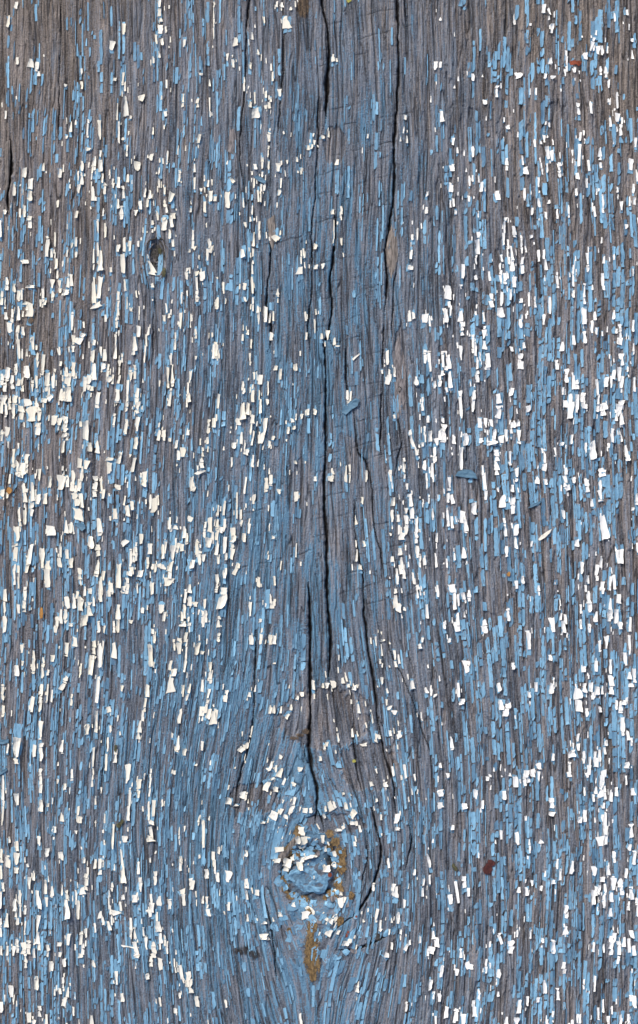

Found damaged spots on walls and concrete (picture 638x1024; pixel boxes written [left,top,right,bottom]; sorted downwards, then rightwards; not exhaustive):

peeling [150,0,186,65]
peeling [529,30,625,144]
crack [382,2,407,361]
peeling [443,138,501,217]
peeling [517,121,604,220]
peeling [616,138,638,210]
crack [308,8,348,833]
peeling [0,16,340,1024]
peeling [369,217,638,964]
peeling [268,632,441,761]
peeling [246,743,569,1024]
peeling [568,969,637,1024]